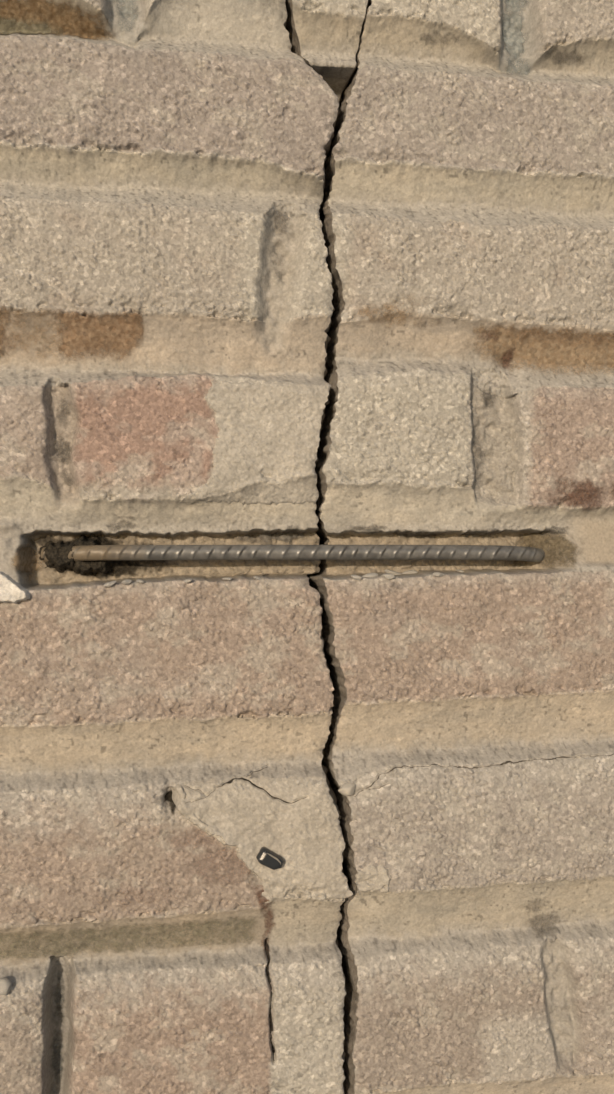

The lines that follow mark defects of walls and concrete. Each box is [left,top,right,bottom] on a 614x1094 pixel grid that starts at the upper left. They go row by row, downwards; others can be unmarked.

crack [186,0,614,1094]